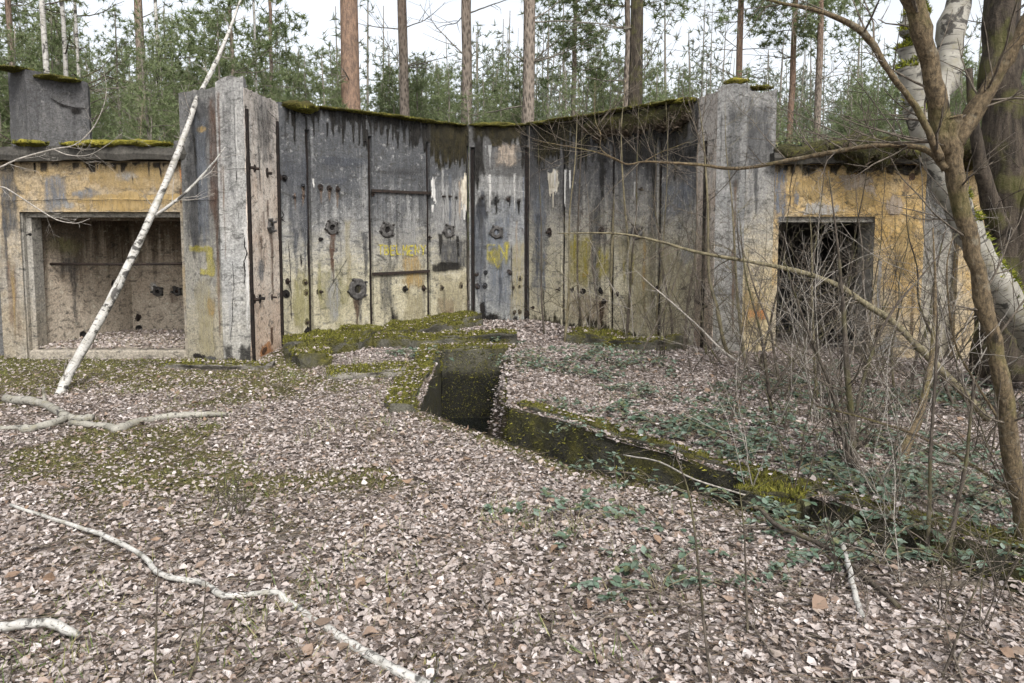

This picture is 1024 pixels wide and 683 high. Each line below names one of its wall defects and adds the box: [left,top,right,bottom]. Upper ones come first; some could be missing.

water stain [286,102,707,342]
peeling [794,173,916,320]